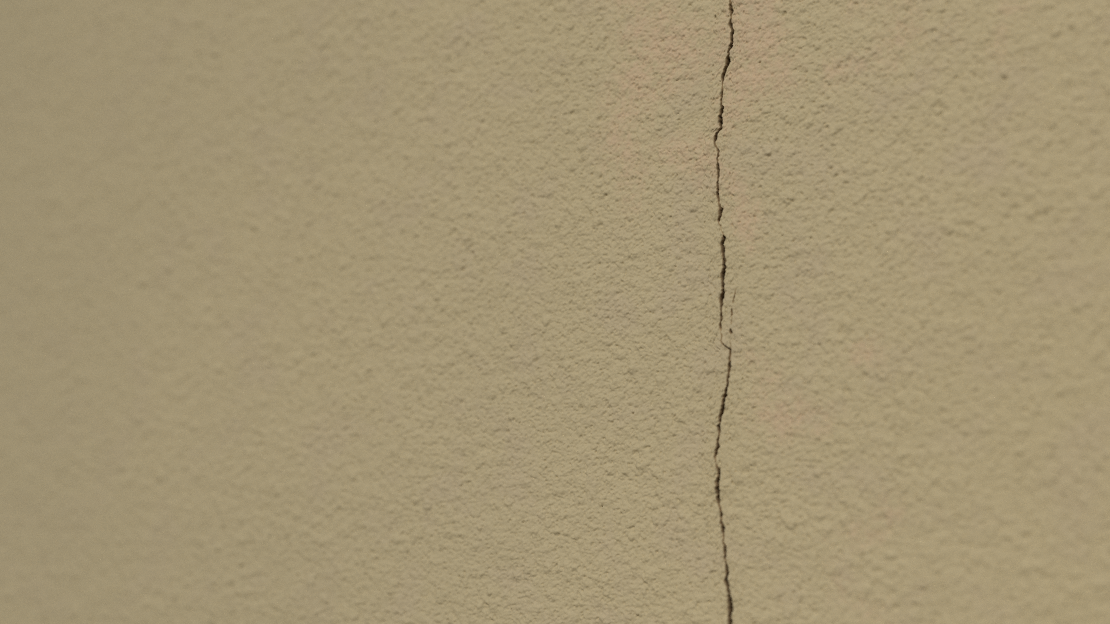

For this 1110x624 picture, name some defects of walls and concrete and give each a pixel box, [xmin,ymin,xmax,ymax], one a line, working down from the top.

crack [713,0,736,624]